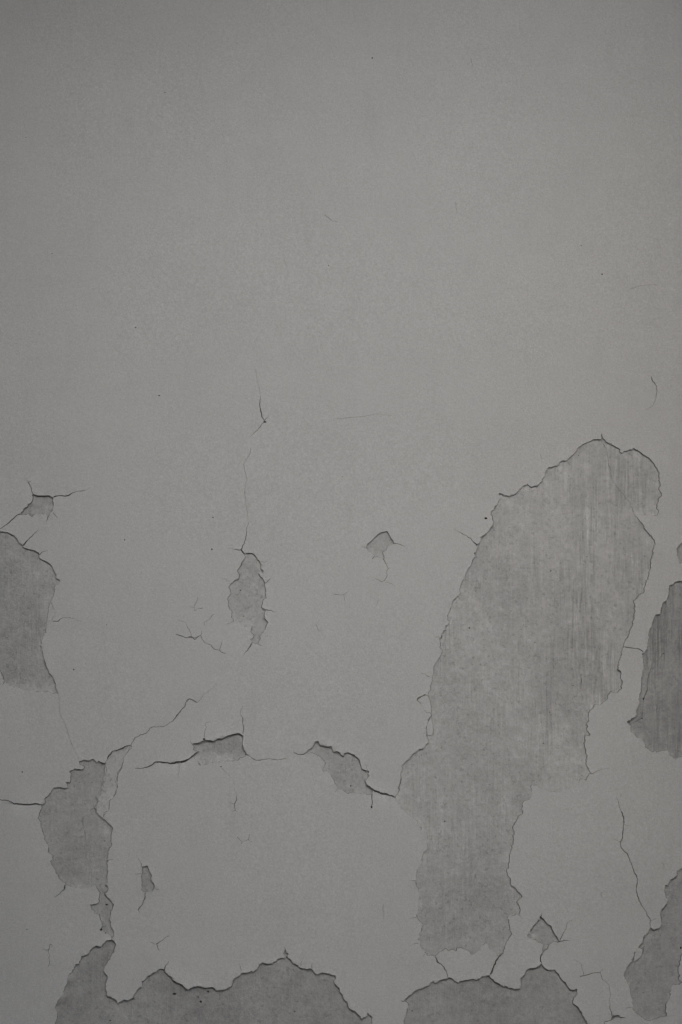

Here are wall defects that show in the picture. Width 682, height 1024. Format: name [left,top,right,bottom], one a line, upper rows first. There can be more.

peeling [0,531,82,694]
crack [104,688,212,815]
peeling [190,706,247,767]
peeling [226,523,273,652]
peeling [362,531,404,568]
peeling [395,434,662,1024]
peeling [627,581,682,759]
peeling [38,741,373,1024]
crack [614,796,656,922]
peeling [604,868,682,1024]